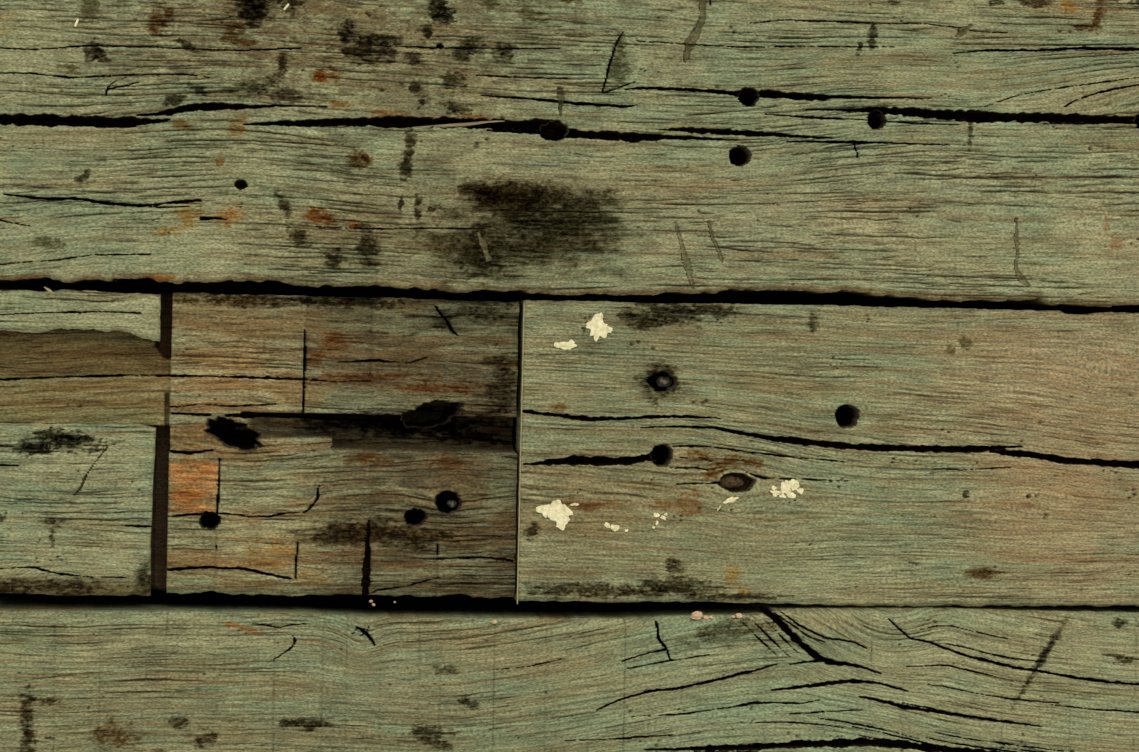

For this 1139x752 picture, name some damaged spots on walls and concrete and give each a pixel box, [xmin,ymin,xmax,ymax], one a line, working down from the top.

crack [0,19,1139,158]
leakage [425,178,629,277]
crack [0,357,428,424]
crack [444,410,1139,485]
peeling [541,503,579,531]
peeling [770,479,804,498]
crack [493,658,563,670]
crack [565,607,1139,752]